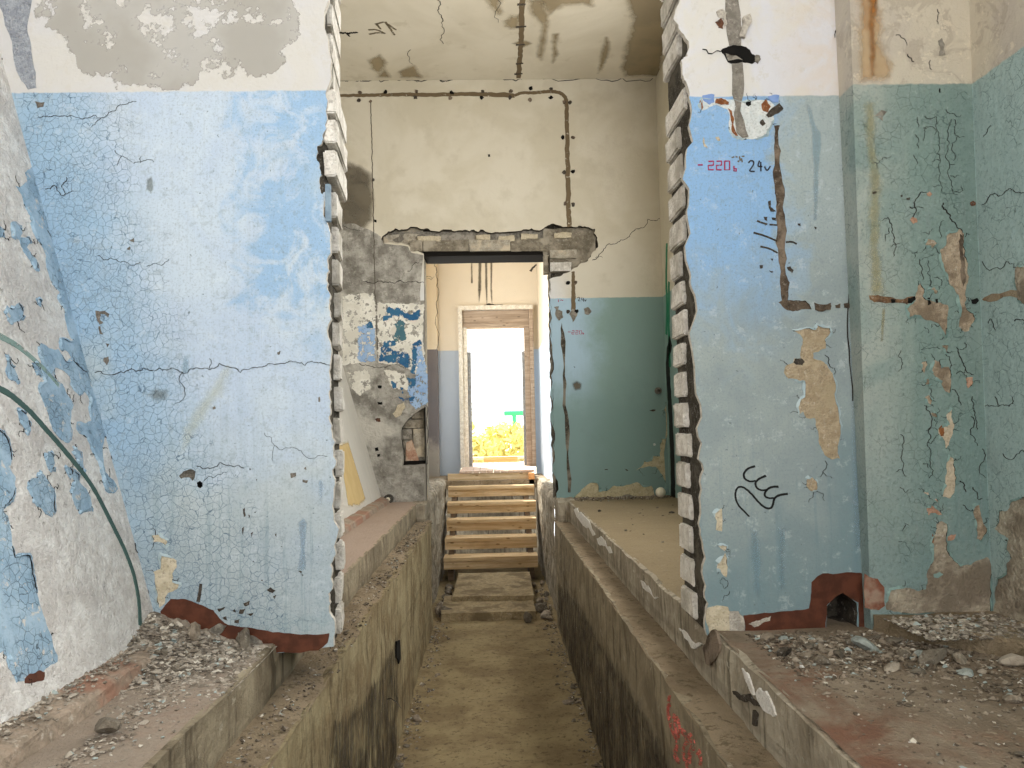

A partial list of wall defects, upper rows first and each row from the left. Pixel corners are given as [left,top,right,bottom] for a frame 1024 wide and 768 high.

peeling [0,0,300,108]
leakage [370,57,388,77]
leakage [400,67,419,77]
leakage [516,0,590,57]
leakage [623,0,664,76]
corrosion [862,0,889,77]
crack [882,110,1024,289]
peeling [0,167,118,685]
crack [94,358,404,404]
spalling [261,0,734,768]
spalling [572,0,783,666]
crack [896,327,1024,511]